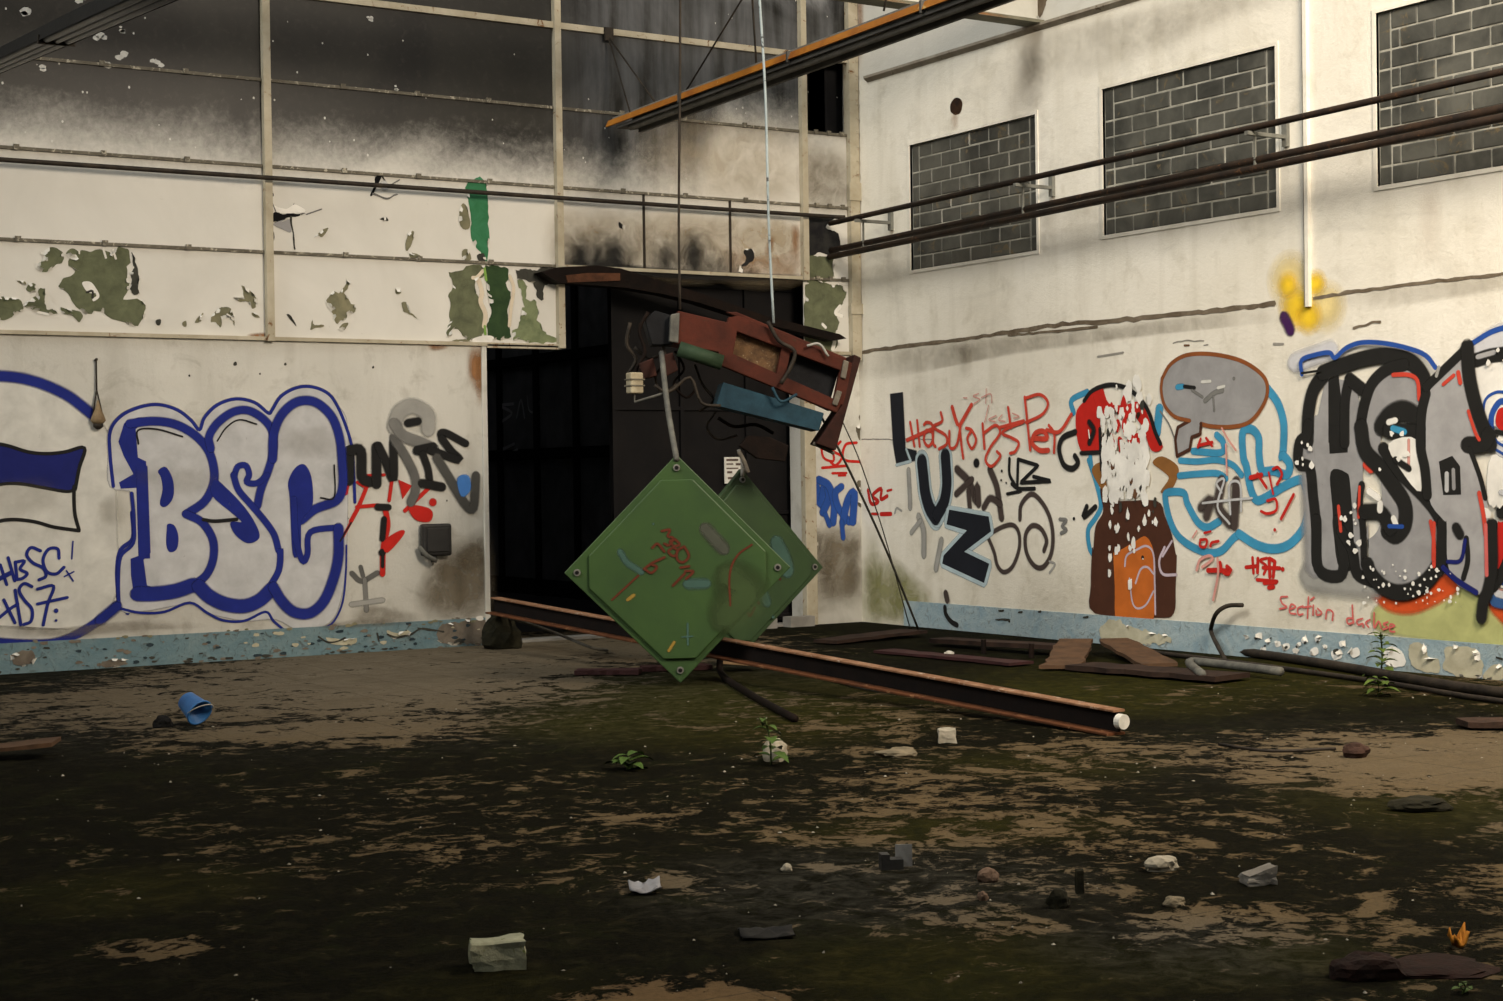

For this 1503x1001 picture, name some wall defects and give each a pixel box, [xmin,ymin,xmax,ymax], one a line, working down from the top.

peeling [405,229,421,262]
peeling [446,177,557,344]
water stain [568,247,625,266]
water stain [685,244,700,271]
peeling [0,246,161,327]
peeling [182,286,260,328]
peeling [287,278,356,331]
peeling [395,287,416,318]
peeling [1243,632,1360,660]
peeling [1383,642,1503,680]